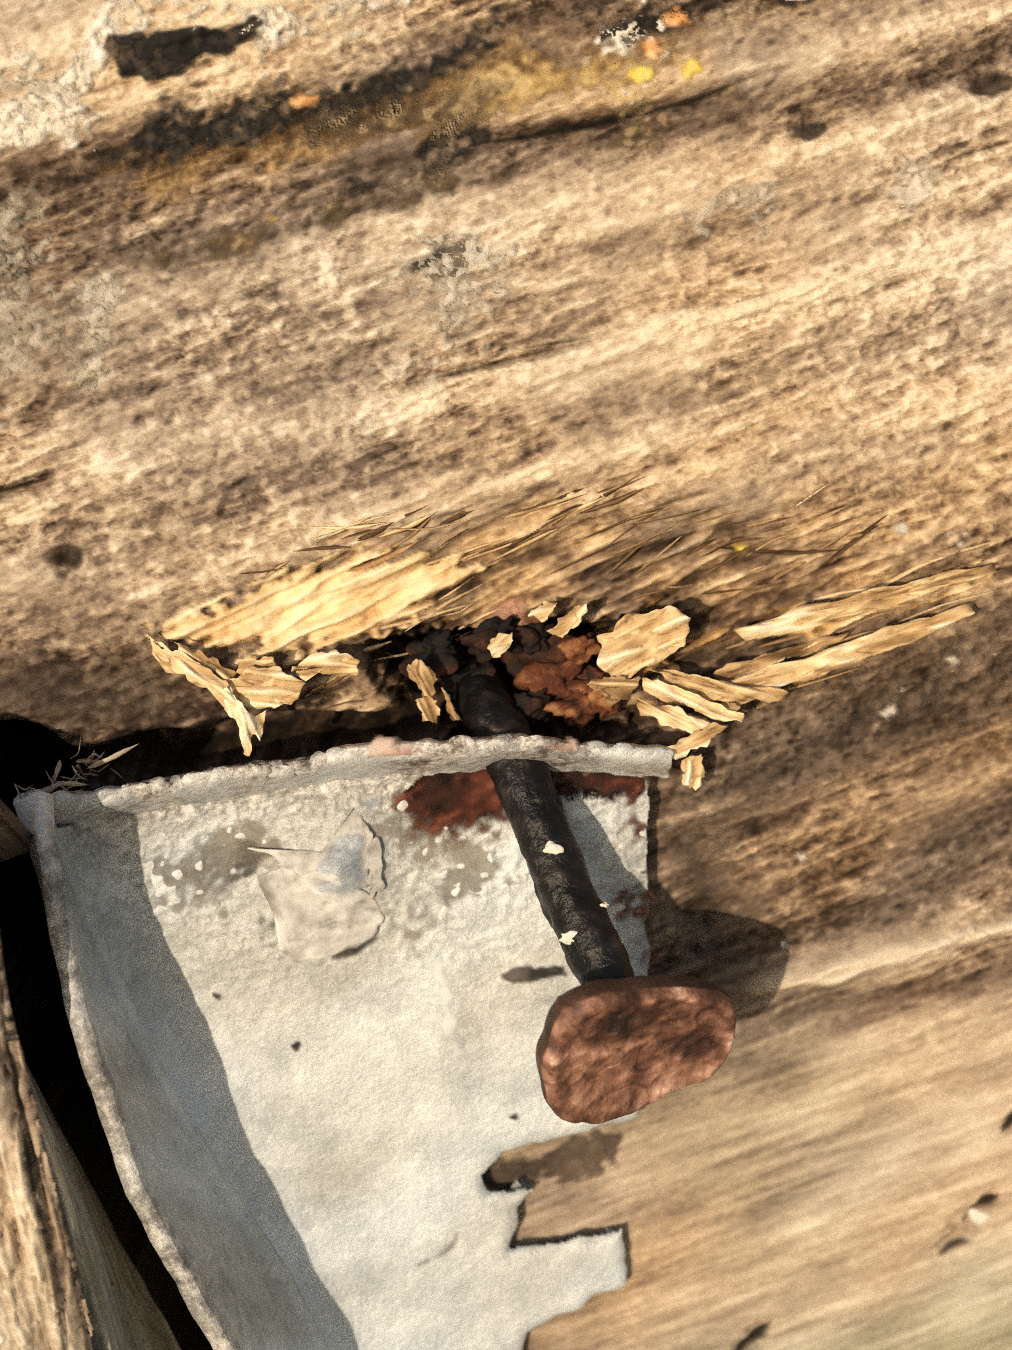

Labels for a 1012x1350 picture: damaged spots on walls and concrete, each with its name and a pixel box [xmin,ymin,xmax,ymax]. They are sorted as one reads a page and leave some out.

rust [492,599,549,627]
peeling [528,601,588,638]
peeling [487,633,513,658]
peeling [145,634,360,756]
peeling [406,659,462,723]
rust [486,657,510,686]
peeling [587,565,997,791]
rust [369,738,411,758]
rust [393,769,508,836]
rust [565,771,648,836]
rust [615,886,651,920]